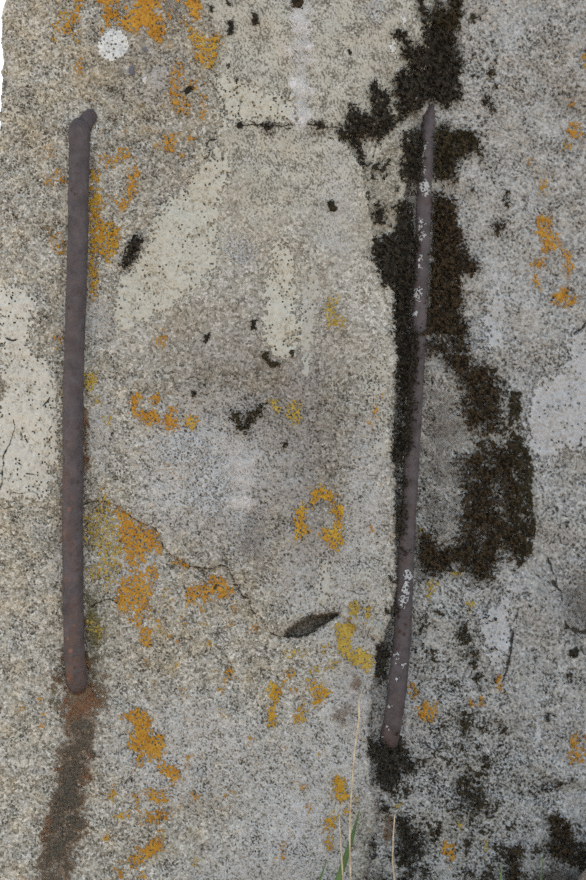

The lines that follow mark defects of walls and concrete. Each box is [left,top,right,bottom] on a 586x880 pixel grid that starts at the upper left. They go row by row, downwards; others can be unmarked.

rust [83,407,92,475]
crack [128,514,284,637]
rust [36,649,112,880]